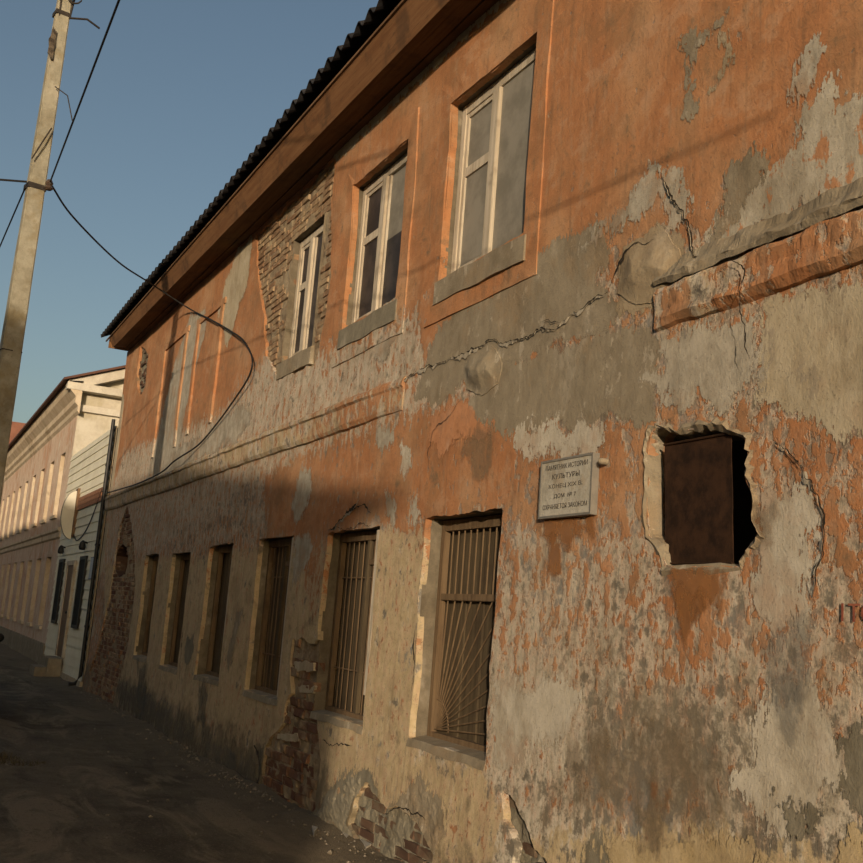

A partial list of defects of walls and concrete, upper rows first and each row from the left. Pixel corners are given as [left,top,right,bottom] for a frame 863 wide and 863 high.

spalling [217,0,509,375]
peeling [578,159,694,255]
crack [662,174,697,258]
peeling [704,32,863,243]
peeling [147,306,252,479]
crack [404,239,653,382]
crack [720,250,750,359]
peeling [638,278,863,649]
crack [774,442,827,598]
spalling [262,638,433,863]
spalling [509,795,547,863]
peeling [580,663,863,863]